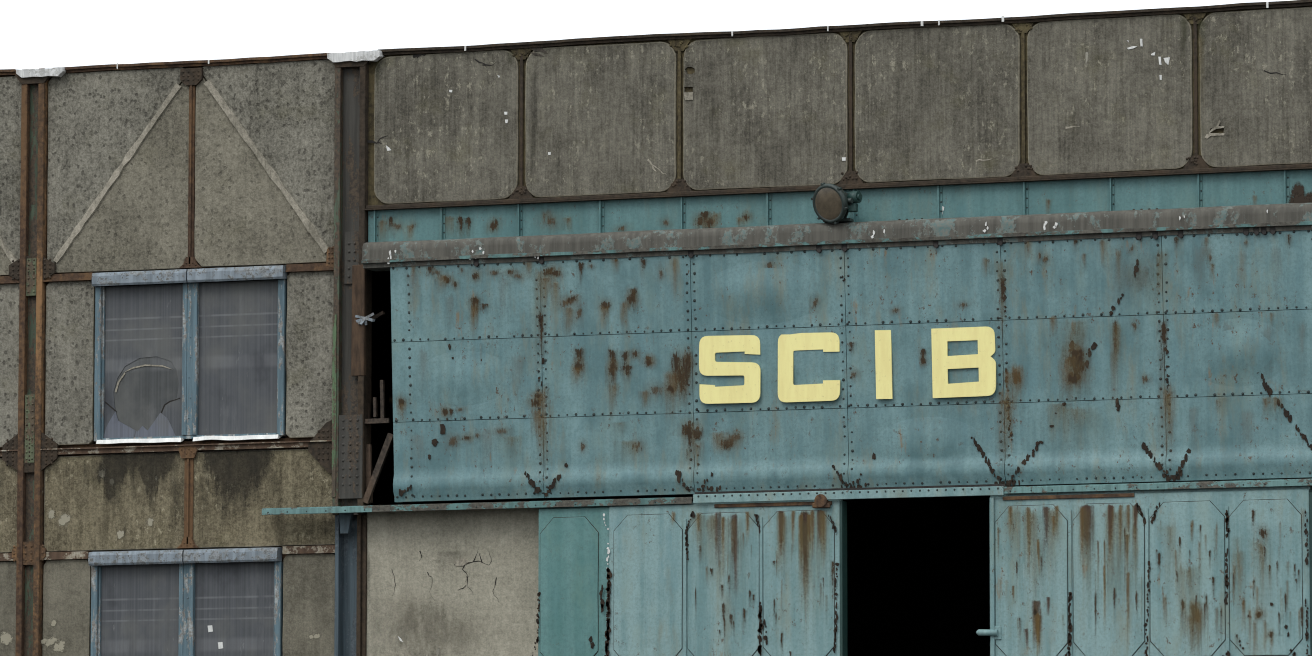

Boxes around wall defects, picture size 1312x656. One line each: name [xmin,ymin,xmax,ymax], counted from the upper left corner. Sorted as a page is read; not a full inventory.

corrosion [608,350,651,389]
corrosion [643,350,691,396]
water stain [93,451,179,502]
water stain [203,448,274,516]
crack [419,551,499,602]
corrosion [697,512,754,637]
corrosion [773,510,824,576]
corrosion [998,506,1058,598]
corrosion [1080,504,1137,624]
peeling [0,632,13,645]
peeling [41,620,65,652]
corrosion [1019,597,1050,649]